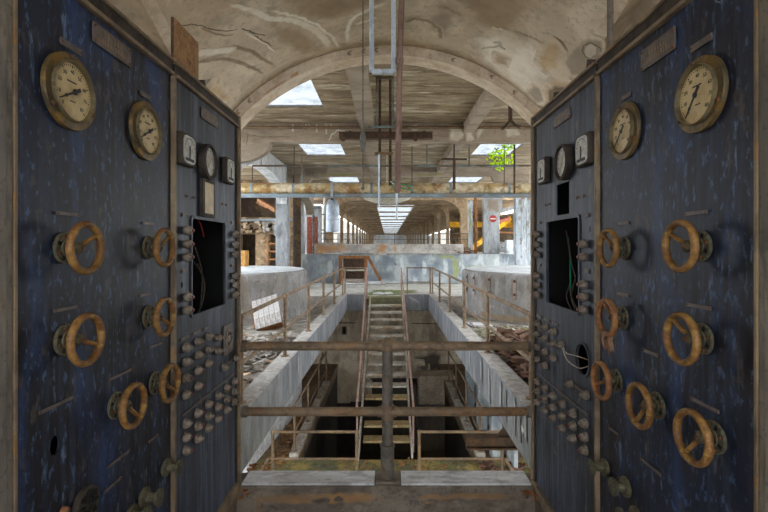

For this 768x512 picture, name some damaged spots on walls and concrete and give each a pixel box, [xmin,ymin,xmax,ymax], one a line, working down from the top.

crack [182,24,277,54]